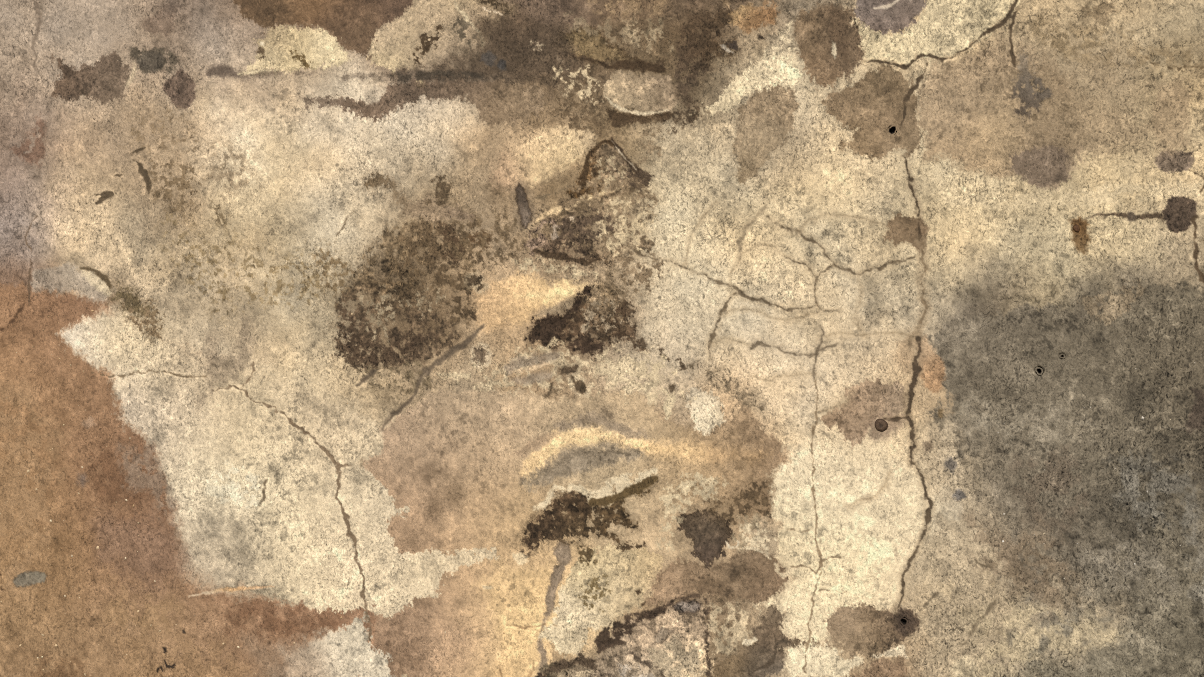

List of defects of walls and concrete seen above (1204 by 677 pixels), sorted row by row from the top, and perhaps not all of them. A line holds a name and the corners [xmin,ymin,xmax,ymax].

leakage [472,0,754,61]
leakage [759,0,929,62]
leakage [910,0,1204,237]
leakage [50,0,622,431]
crack [1182,165,1204,285]
crack [352,366,383,390]
crack [379,321,487,436]
crack [623,0,1023,677]
crack [91,360,378,648]
leakage [510,464,784,567]
peeling [527,376,942,677]
leakage [920,408,976,507]